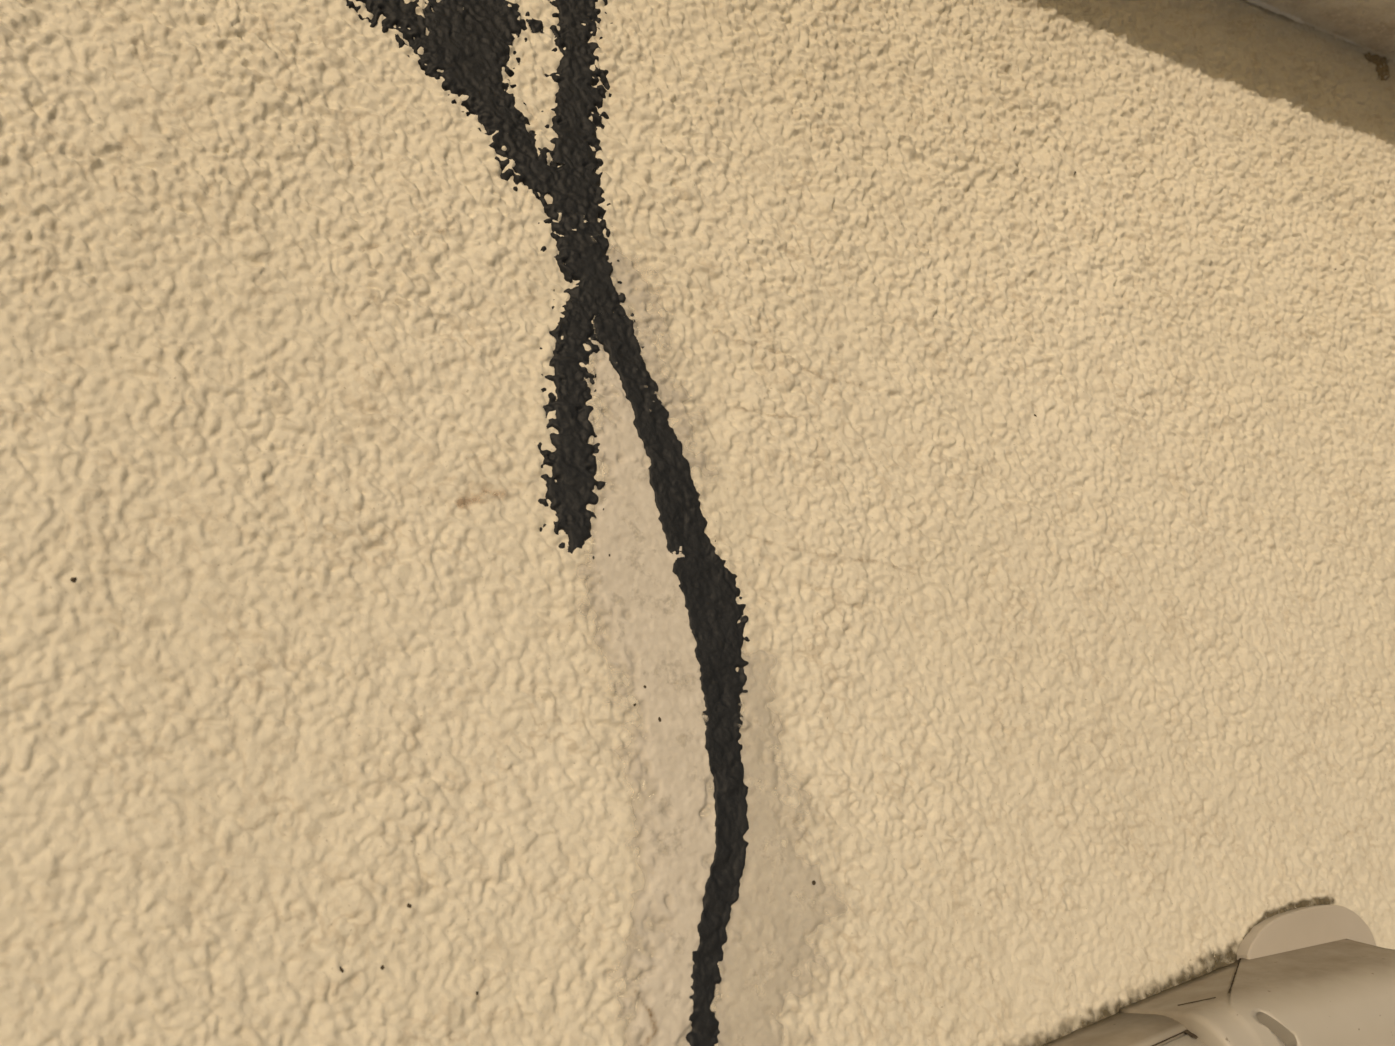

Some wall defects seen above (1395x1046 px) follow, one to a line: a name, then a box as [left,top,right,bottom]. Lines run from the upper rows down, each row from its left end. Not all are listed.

crack [346,0,750,1046]